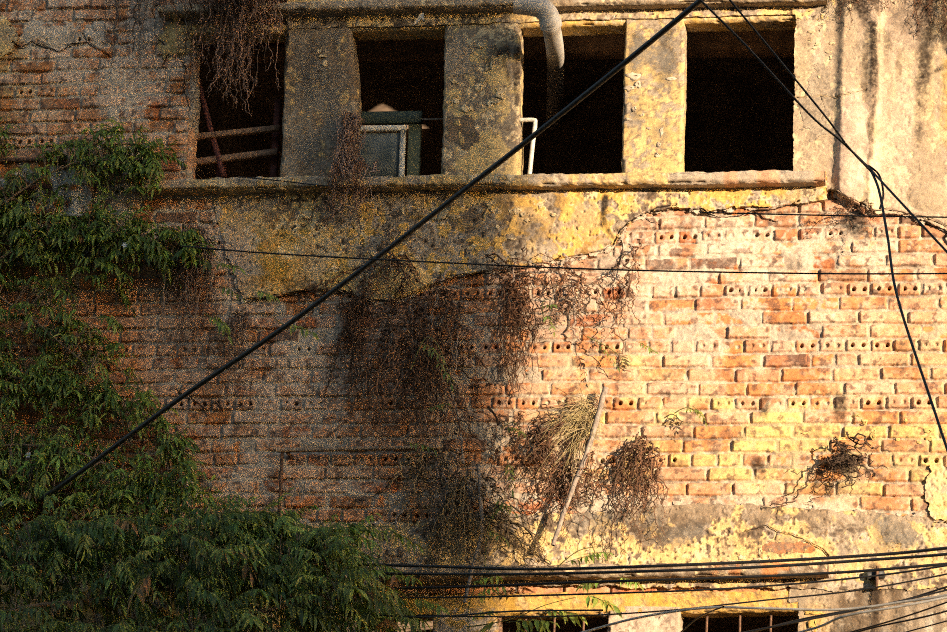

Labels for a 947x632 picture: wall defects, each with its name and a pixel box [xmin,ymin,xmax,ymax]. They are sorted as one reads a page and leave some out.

peeling [444,31,504,108]
peeling [624,72,642,92]
leakage [854,0,879,154]
leakage [916,0,947,89]
spalling [446,97,480,150]
spalling [881,521,917,544]
leakage [840,564,902,632]